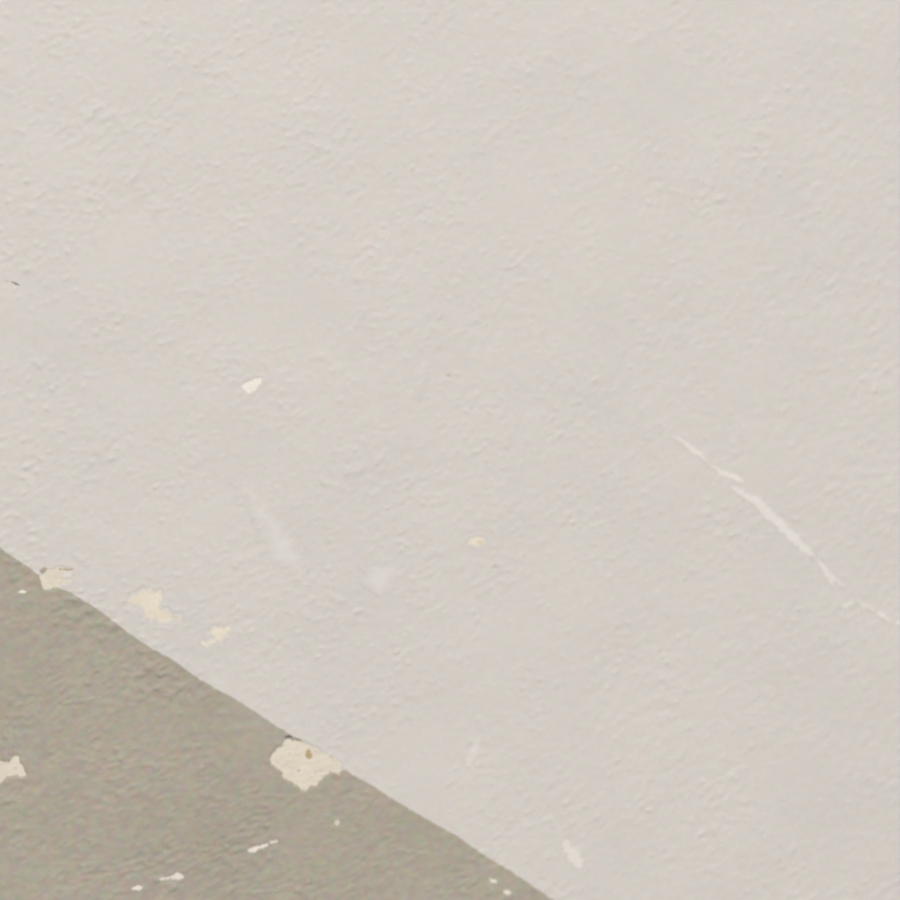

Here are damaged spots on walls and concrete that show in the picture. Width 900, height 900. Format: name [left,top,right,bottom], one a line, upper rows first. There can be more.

peeling [39,566,75,590]
peeling [0,756,26,782]
peeling [270,734,346,790]